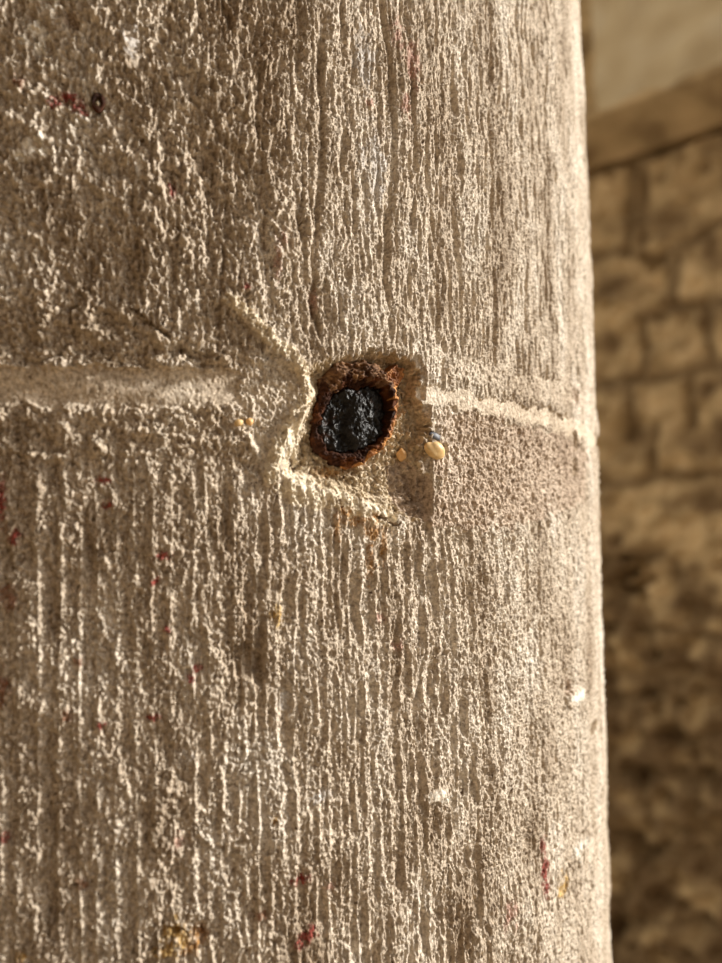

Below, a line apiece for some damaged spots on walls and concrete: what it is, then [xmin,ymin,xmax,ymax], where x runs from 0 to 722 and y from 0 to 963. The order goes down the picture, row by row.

corrosion [320,365,405,475]